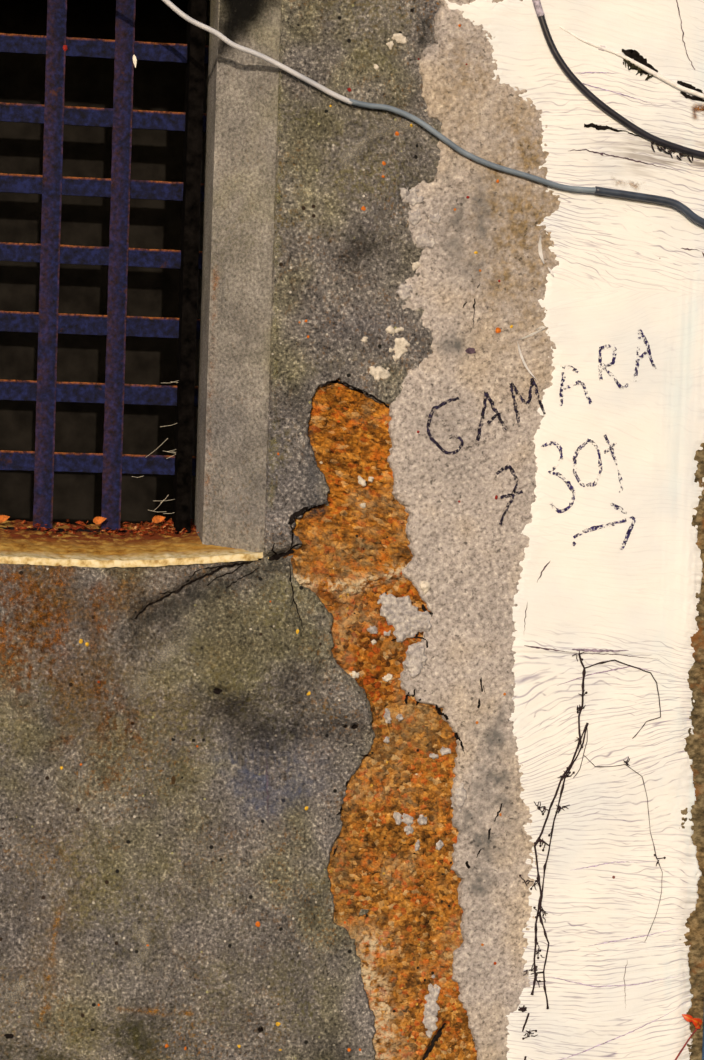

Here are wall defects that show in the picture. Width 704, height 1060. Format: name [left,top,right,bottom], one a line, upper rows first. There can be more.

crack [135,505,321,630]
spalling [283,379,477,1060]